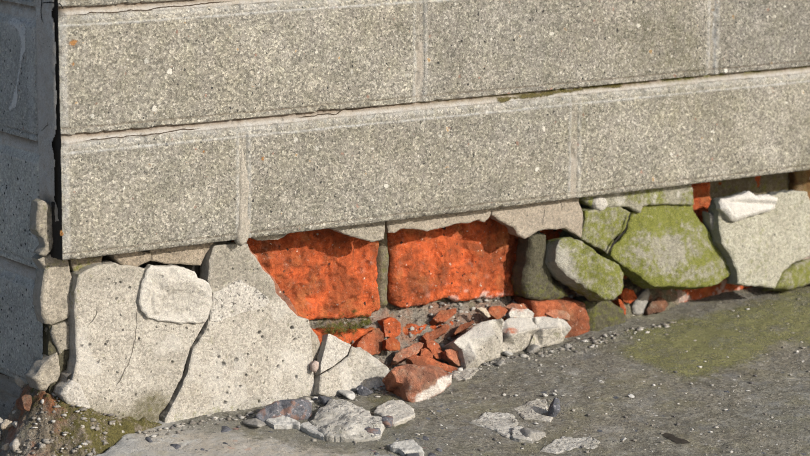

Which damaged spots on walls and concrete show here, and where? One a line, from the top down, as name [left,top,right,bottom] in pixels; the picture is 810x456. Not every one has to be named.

crack [41,0,230,261]
spalling [702,190,810,288]
crack [115,308,138,389]
crack [159,325,204,416]
spalling [53,240,513,427]
spalling [560,284,584,299]
spalling [610,277,679,319]